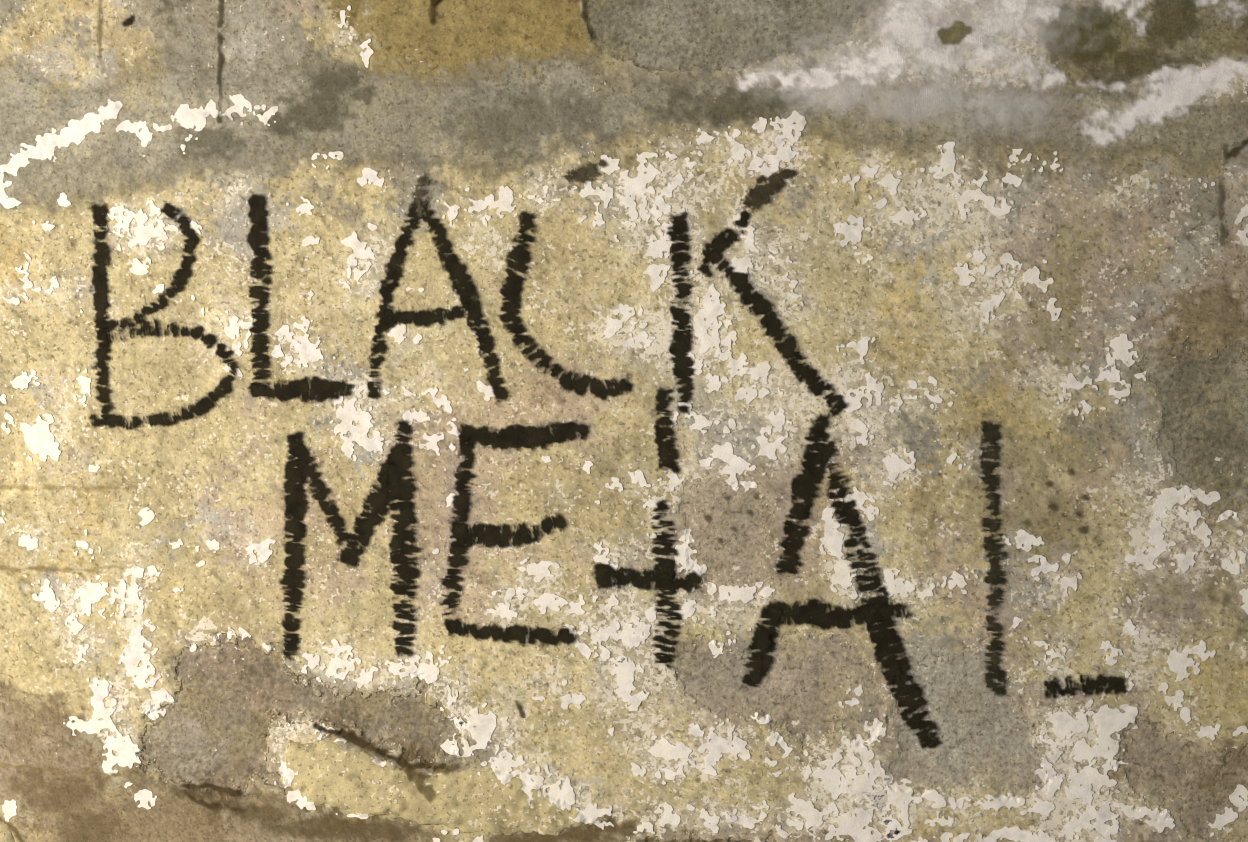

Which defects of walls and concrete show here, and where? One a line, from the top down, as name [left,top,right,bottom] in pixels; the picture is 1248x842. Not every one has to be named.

crack [95,4,103,47]
crack [216,0,224,123]
crack [580,0,594,39]
water stain [0,0,1248,211]
peeling [436,110,807,292]
peeling [832,142,1063,225]
peeling [331,384,460,461]
flaking render [31,529,614,830]
peeling [487,559,661,711]
water stain [0,685,456,842]
crack [313,724,458,801]
water stain [471,819,636,842]